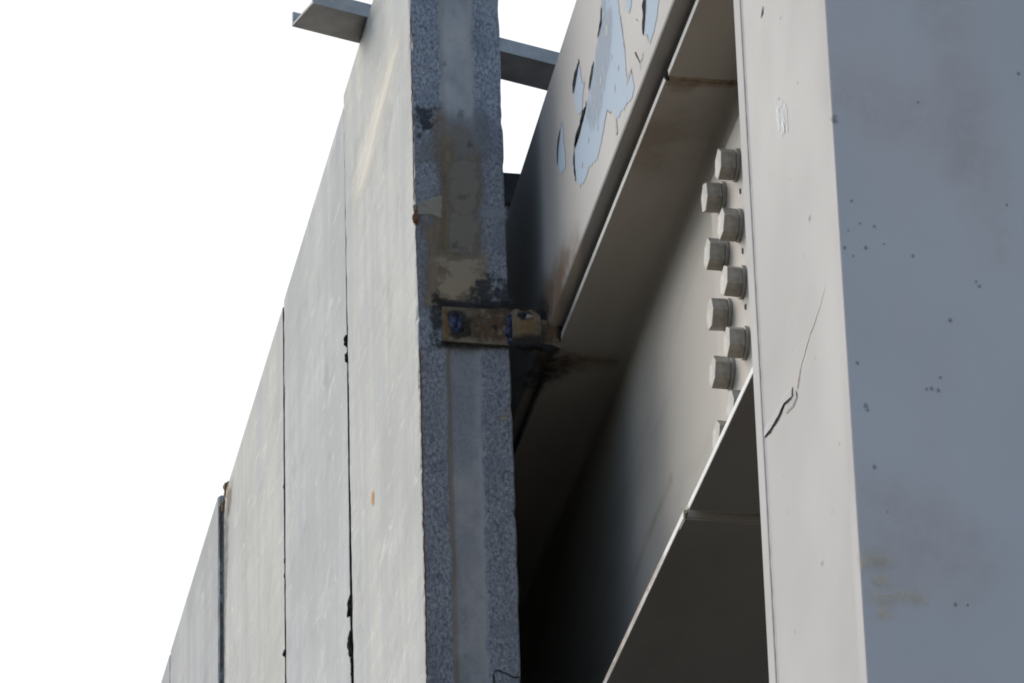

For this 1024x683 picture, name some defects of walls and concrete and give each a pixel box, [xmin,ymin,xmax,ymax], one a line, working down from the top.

peeling [556,0,659,187]
leakage [414,106,512,348]
crack [764,286,825,437]